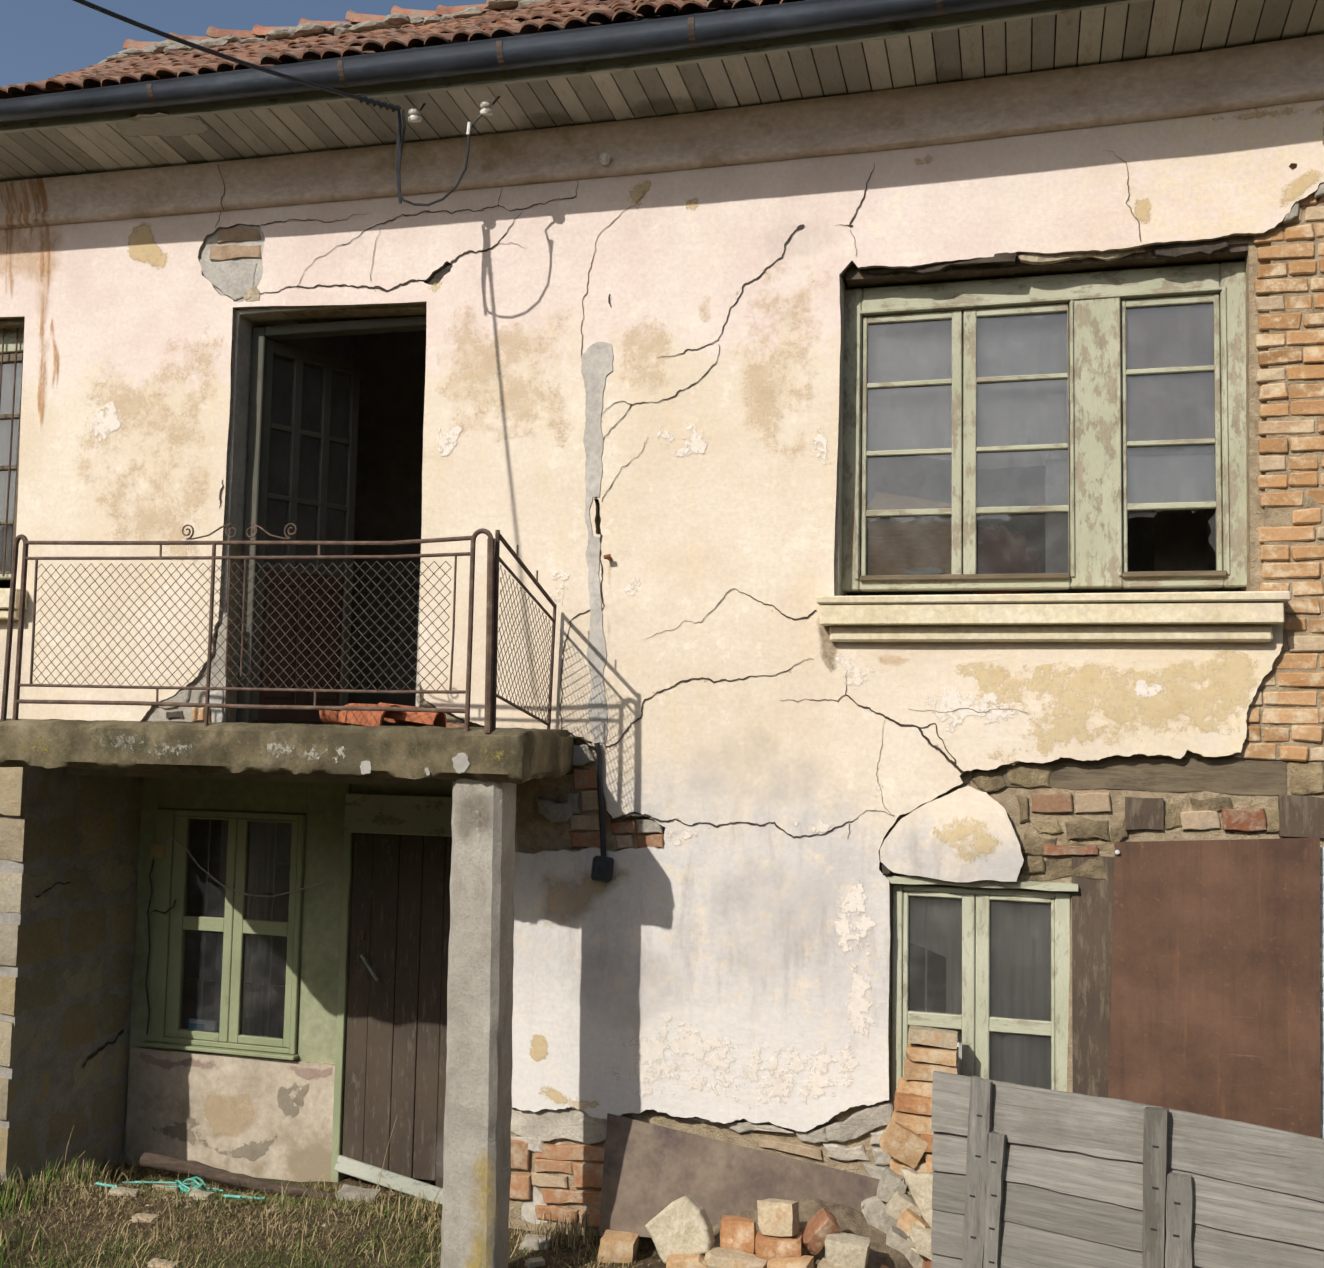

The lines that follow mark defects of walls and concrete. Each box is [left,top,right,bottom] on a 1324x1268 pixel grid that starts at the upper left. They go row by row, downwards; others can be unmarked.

rust [1,178,49,278]
spalling [200,225,265,302]
crack [246,185,578,300]
crack [581,191,645,356]
crack [835,163,875,255]
crack [1103,150,1141,242]
rust [37,313,59,421]
crack [601,229,800,439]
flaking render [924,165,1324,762]
crack [559,535,1028,839]
flaking render [570,769,697,850]
peeling [541,1087,599,1109]